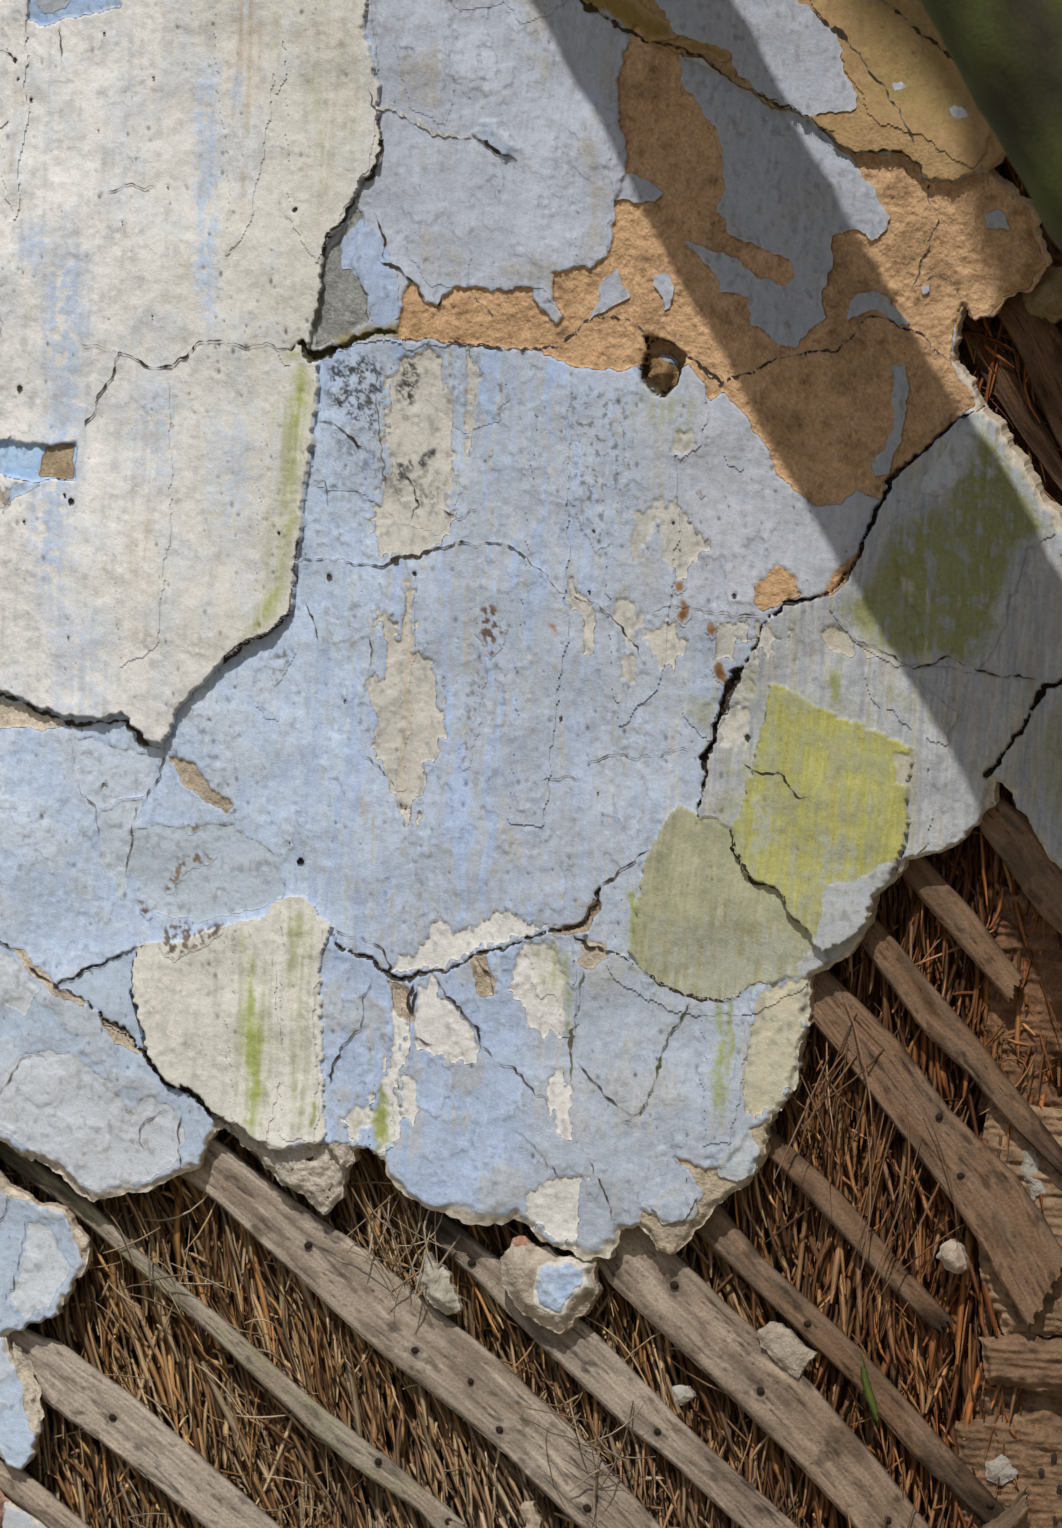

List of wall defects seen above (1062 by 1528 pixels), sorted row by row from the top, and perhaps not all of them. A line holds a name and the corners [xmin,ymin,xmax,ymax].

crack [317,89,474,302]
peeling [0,422,78,513]
crack [81,291,985,807]
peeling [312,0,1046,826]
crack [0,693,165,870]
peeling [0,699,285,962]
crack [855,638,1062,779]
peeling [0,1048,186,1201]
crack [0,941,218,1170]
peeling [211,898,608,1214]
crack [328,849,775,1219]
spalling [640,861,900,1255]